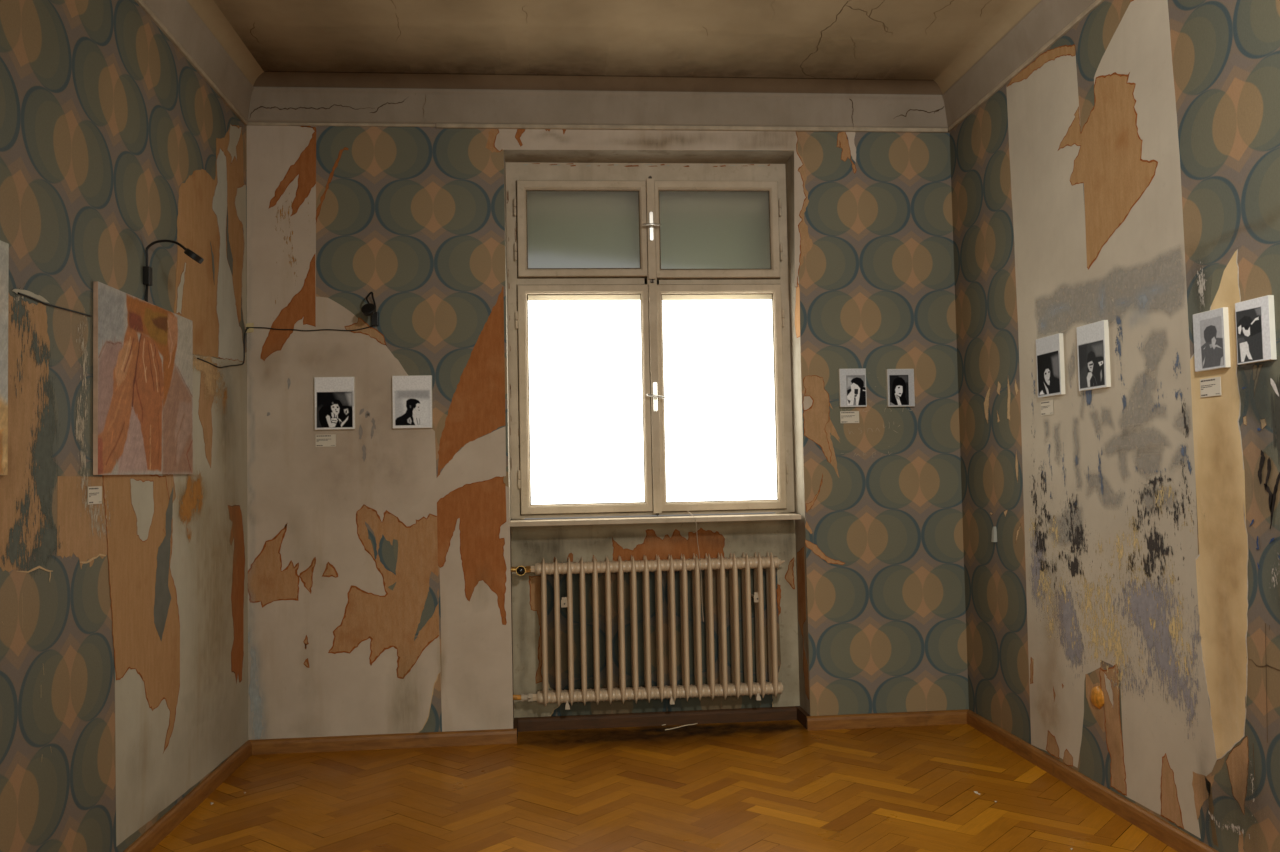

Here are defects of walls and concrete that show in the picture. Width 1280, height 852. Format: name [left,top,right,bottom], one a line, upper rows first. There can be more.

crack [800,0,892,123]
peeling [268,126,316,216]
peeling [1058,72,1158,270]
peeling [260,254,316,361]
peeling [248,524,338,608]
peeling [328,466,512,679]